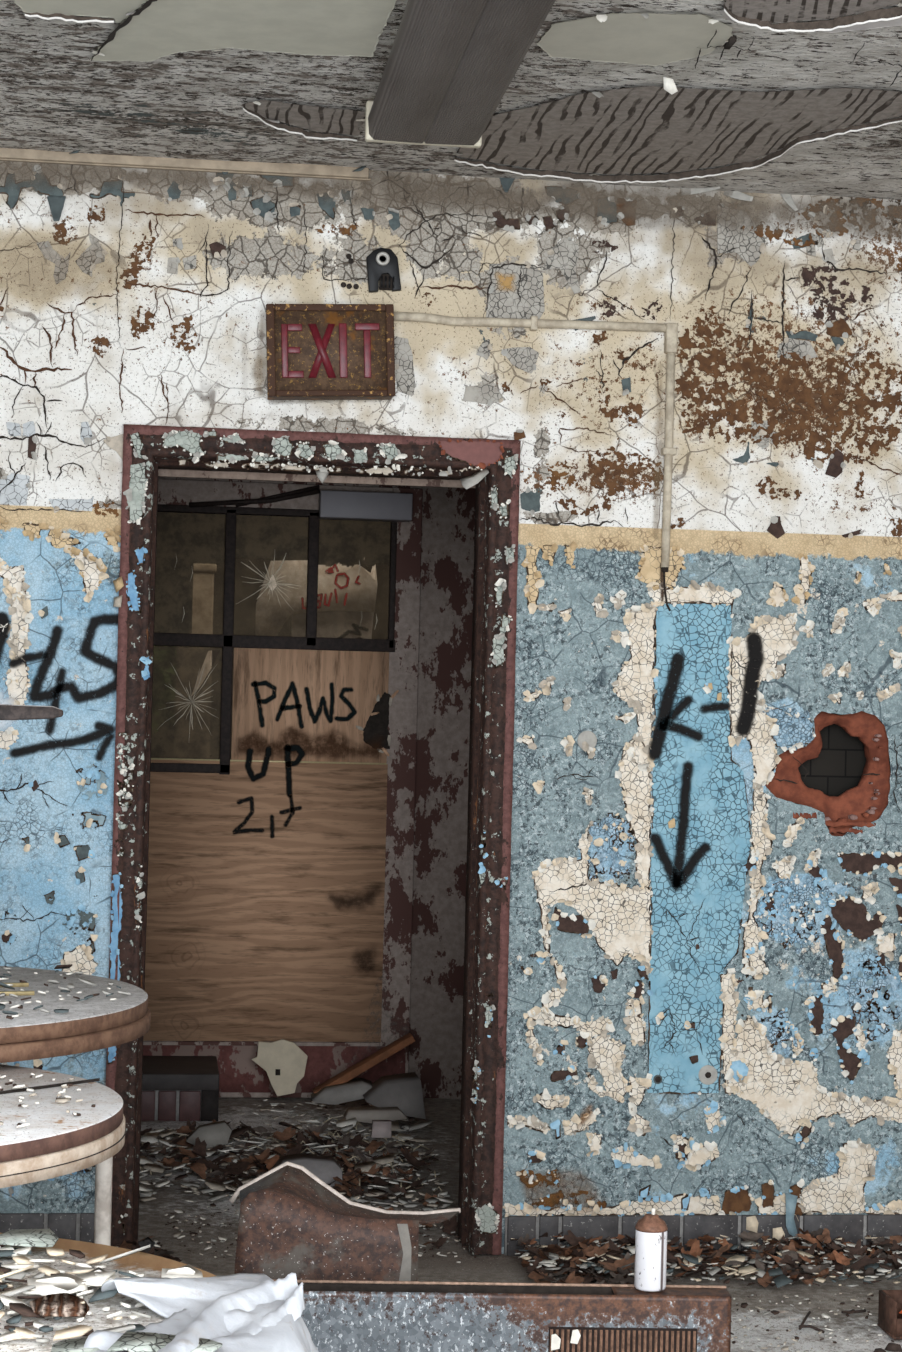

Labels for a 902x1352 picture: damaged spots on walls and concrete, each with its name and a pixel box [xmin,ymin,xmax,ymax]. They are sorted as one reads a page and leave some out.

crack [0,170,236,512]
peeling [161,429,540,519]
crack [351,171,546,318]
rust [591,297,631,364]
peeling [454,86,902,233]
rust [675,305,902,501]
rust [889,518,902,537]
crack [654,601,751,875]
peeling [0,732,145,1020]
peeling [475,542,902,1275]
crack [648,898,745,1125]
peeling [0,1099,476,1343]